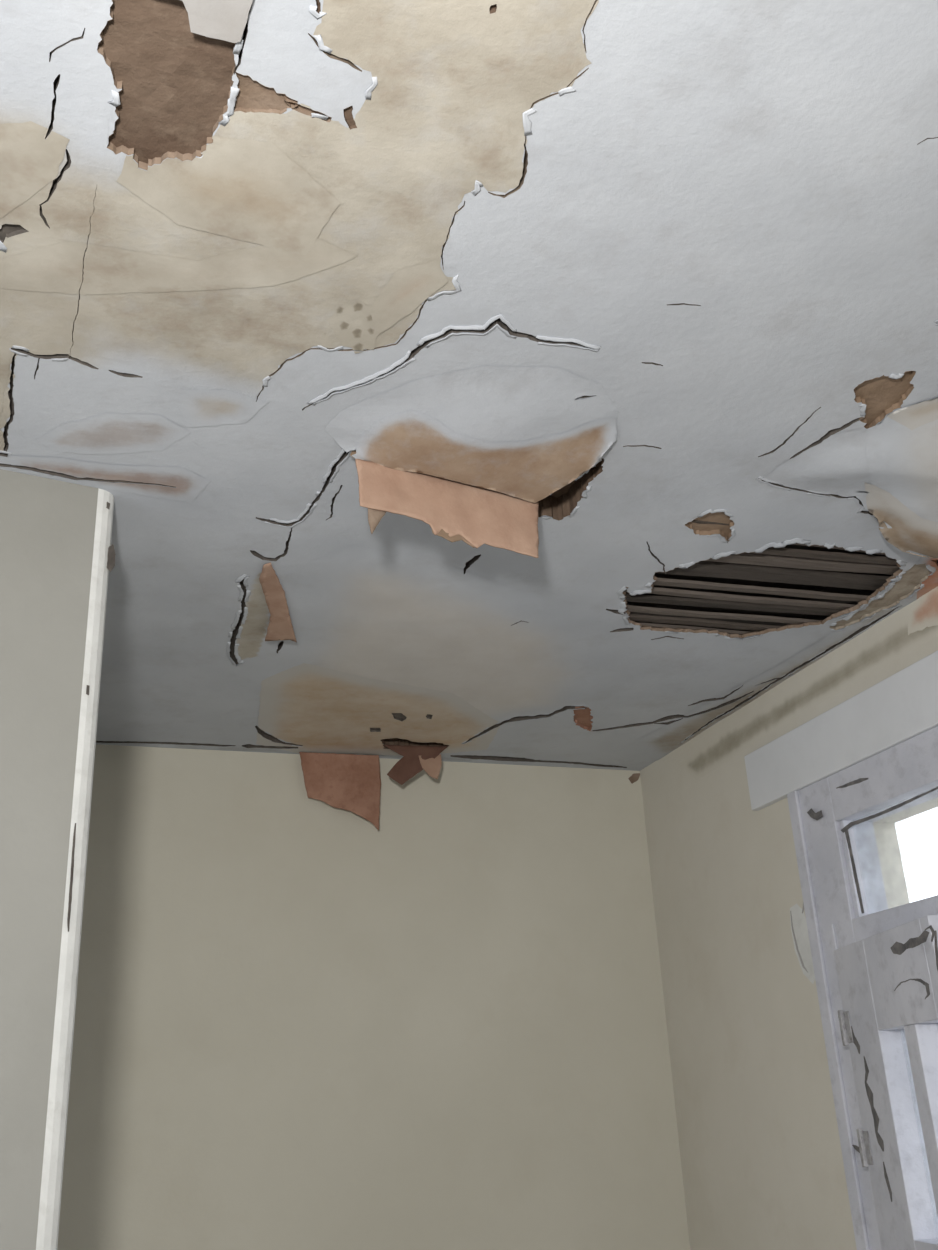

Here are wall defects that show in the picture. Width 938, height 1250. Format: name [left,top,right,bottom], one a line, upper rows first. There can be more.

damp [0,121,70,218]
damp [0,136,357,295]
peeling [0,0,599,451]
damp [327,260,448,354]
damp [0,338,13,413]
crack [302,314,601,411]
flaking render [758,371,916,459]
crack [250,449,356,561]
peeling [568,465,595,517]
peeling [226,562,297,666]
flaking render [606,509,938,640]